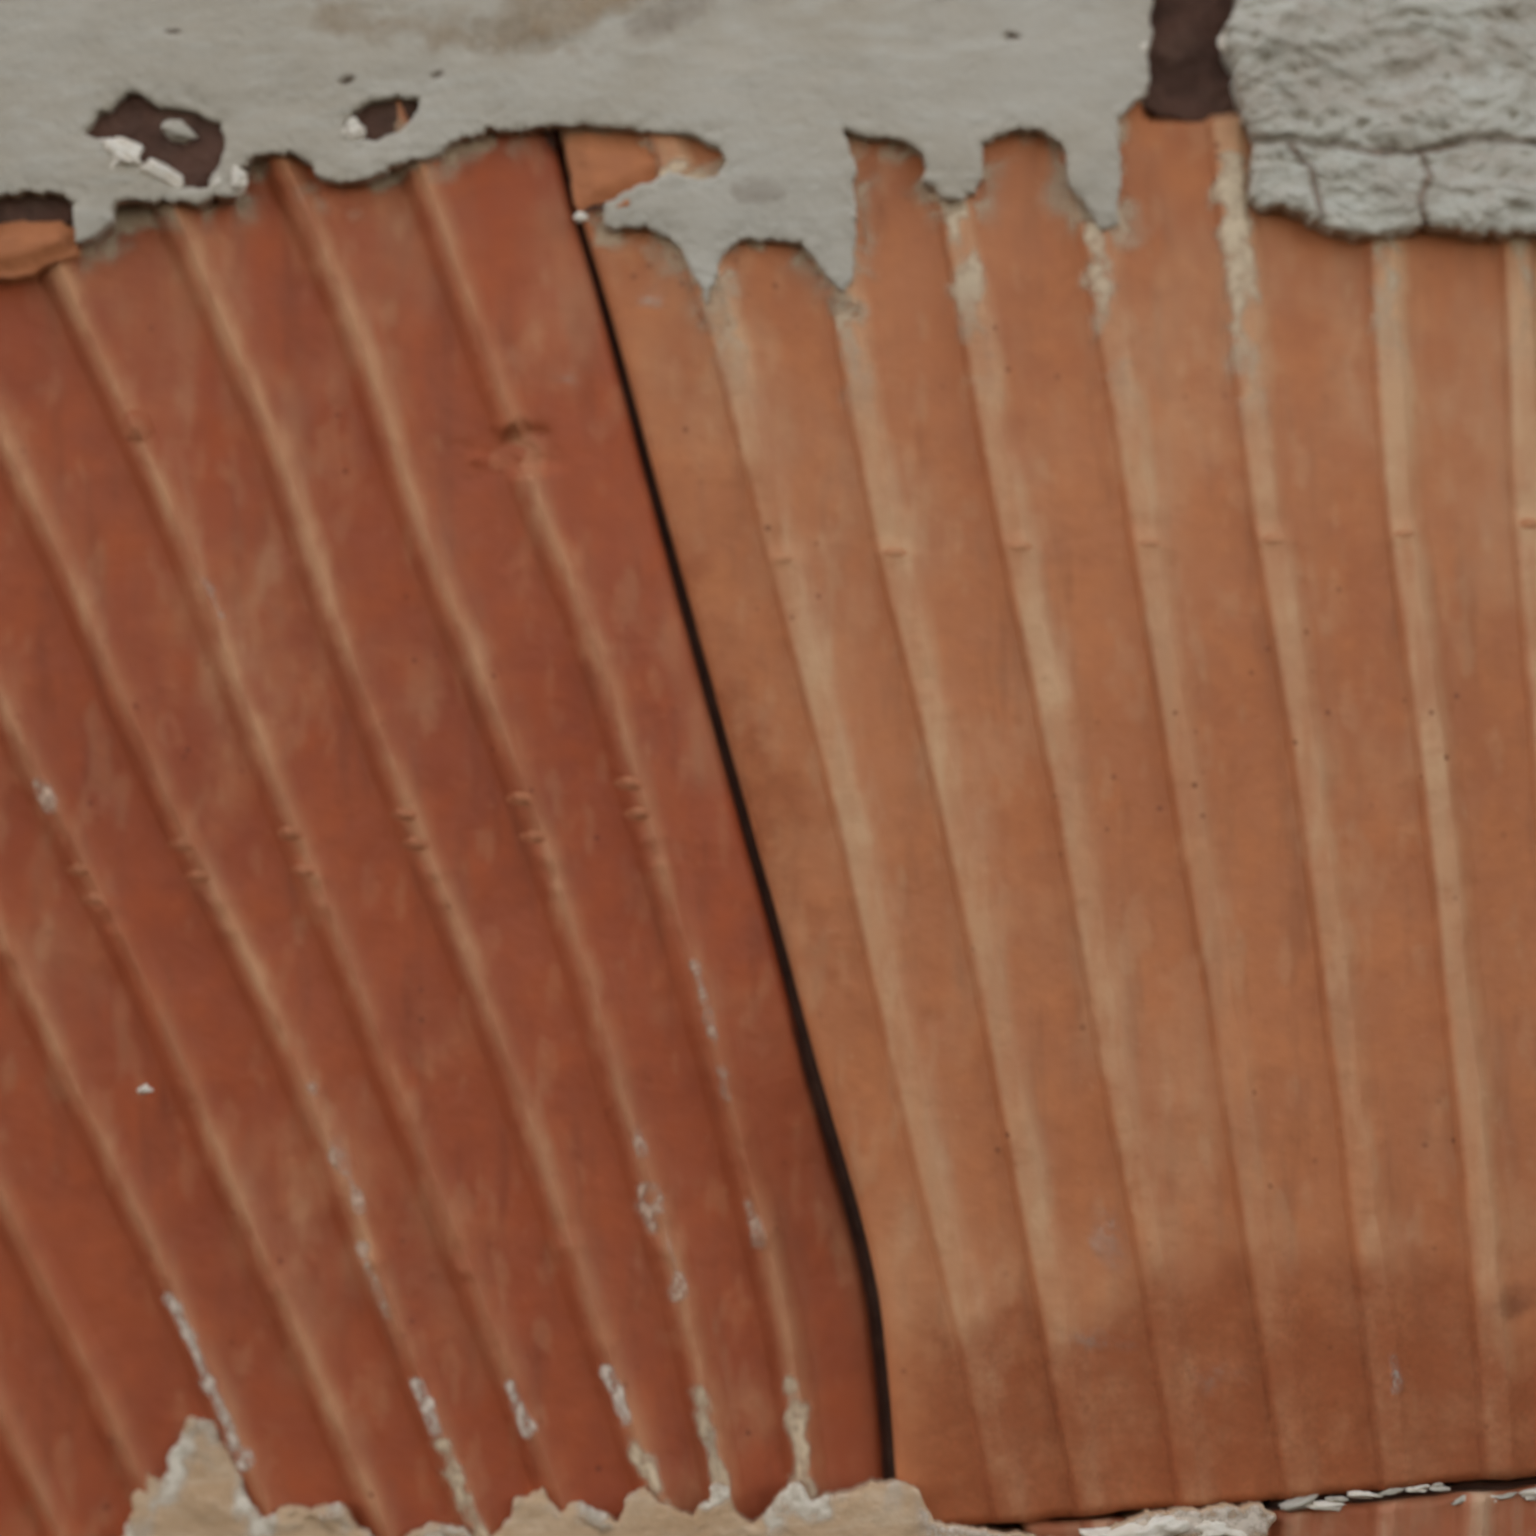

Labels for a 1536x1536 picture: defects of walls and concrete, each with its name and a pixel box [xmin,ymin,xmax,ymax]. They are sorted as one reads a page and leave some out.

flaking render [87,95,249,208]
spalling [565,132,657,223]
spalling [0,195,82,283]
crack [542,131,896,1480]
peeling [1078,1526,1111,1536]
peeling [1194,1520,1249,1536]
peeling [1305,1483,1451,1512]
peeling [1490,1487,1536,1503]